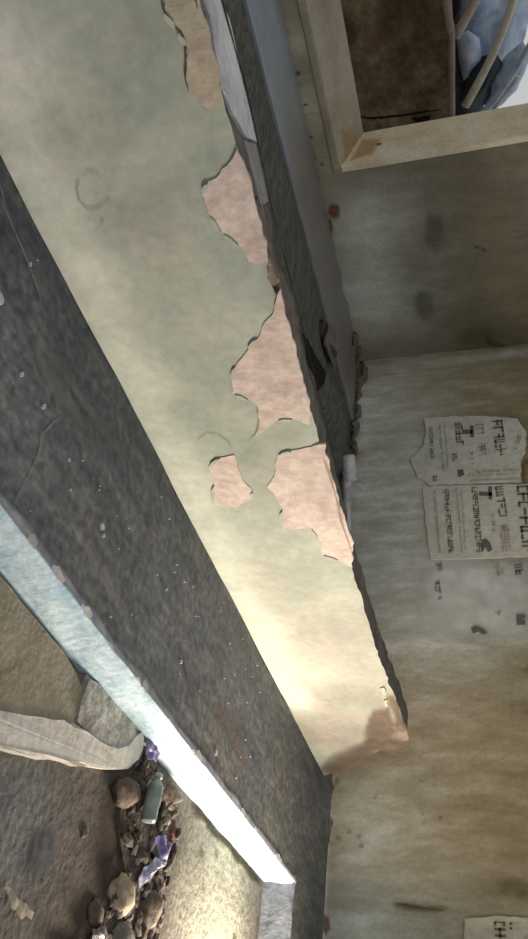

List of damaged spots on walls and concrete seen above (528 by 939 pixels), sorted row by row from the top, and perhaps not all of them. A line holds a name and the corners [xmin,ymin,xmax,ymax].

rust [346,133,381,156]
peeling [164,0,326,437]
peeling [208,454,253,508]
peeling [267,442,354,568]
leakage [324,698,406,773]